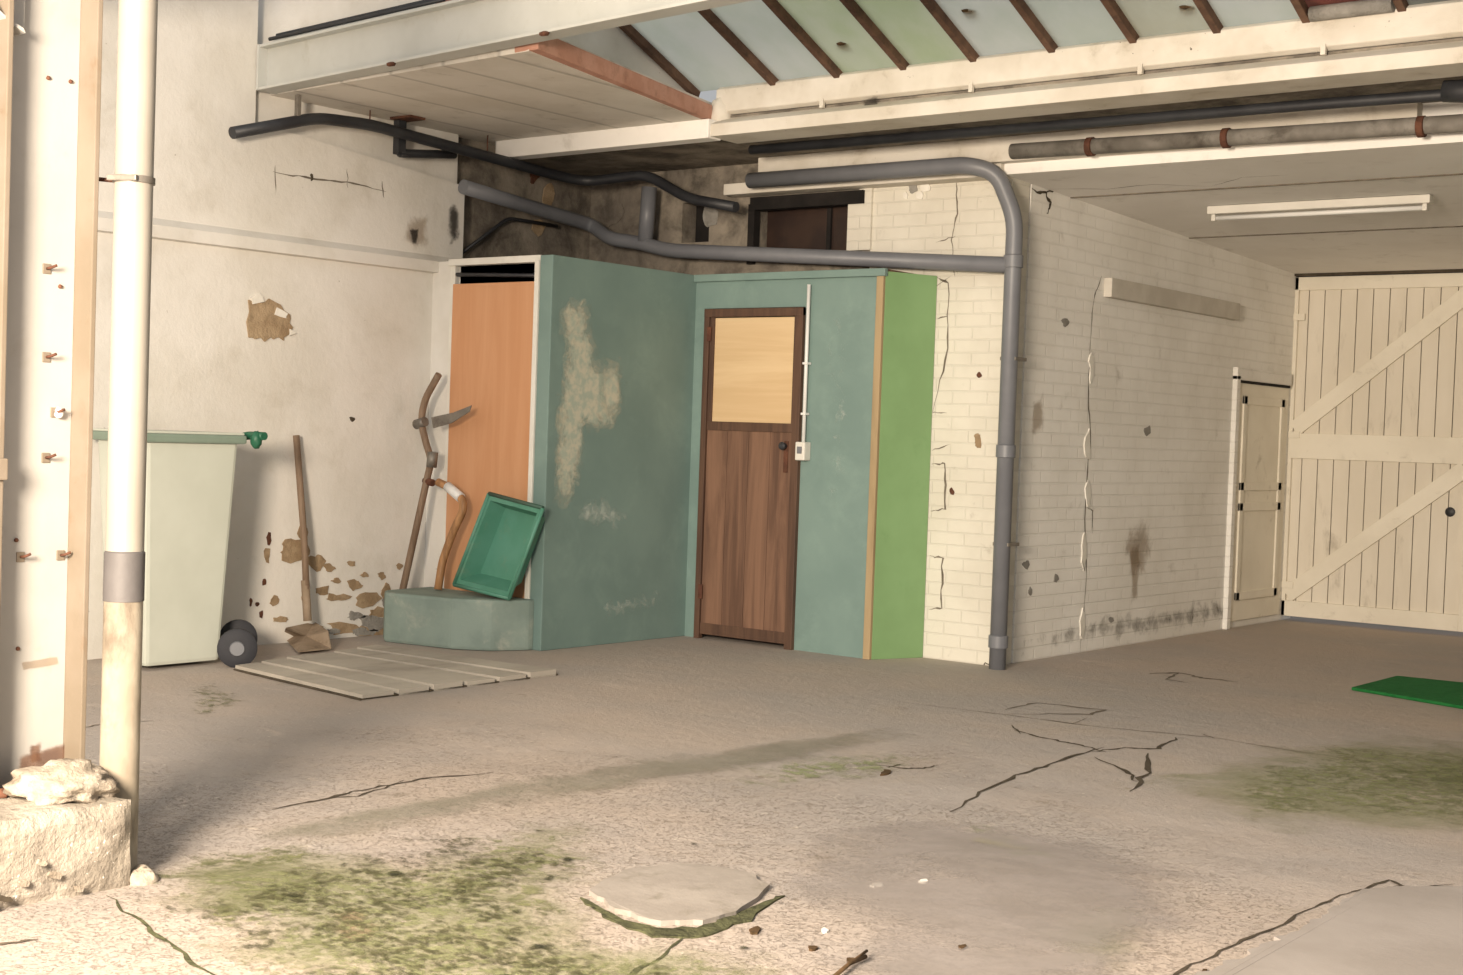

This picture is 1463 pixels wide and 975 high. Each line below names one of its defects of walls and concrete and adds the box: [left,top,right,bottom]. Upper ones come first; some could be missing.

spalling [246,293,296,342]
peeling [557,301,620,496]
peeling [249,526,403,636]
corrosion [20,745,65,768]
crack [272,772,491,810]
crack [906,702,1384,812]
spalling [0,858,84,902]
crack [0,938,38,946]
crack [106,895,215,975]
crack [1173,879,1448,975]